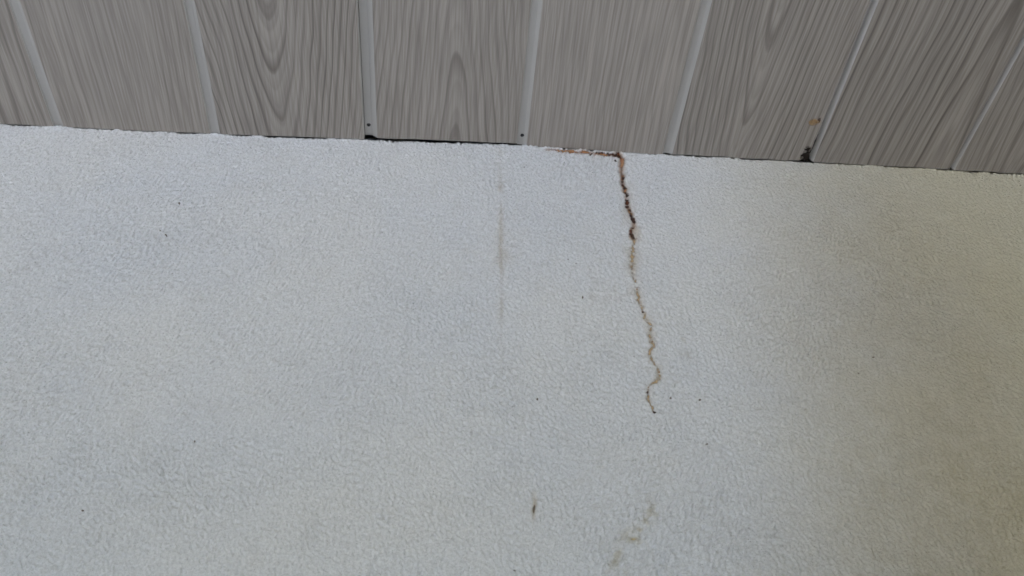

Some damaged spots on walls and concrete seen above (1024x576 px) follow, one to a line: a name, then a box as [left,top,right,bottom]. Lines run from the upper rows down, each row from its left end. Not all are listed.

crack [614,152,660,414]